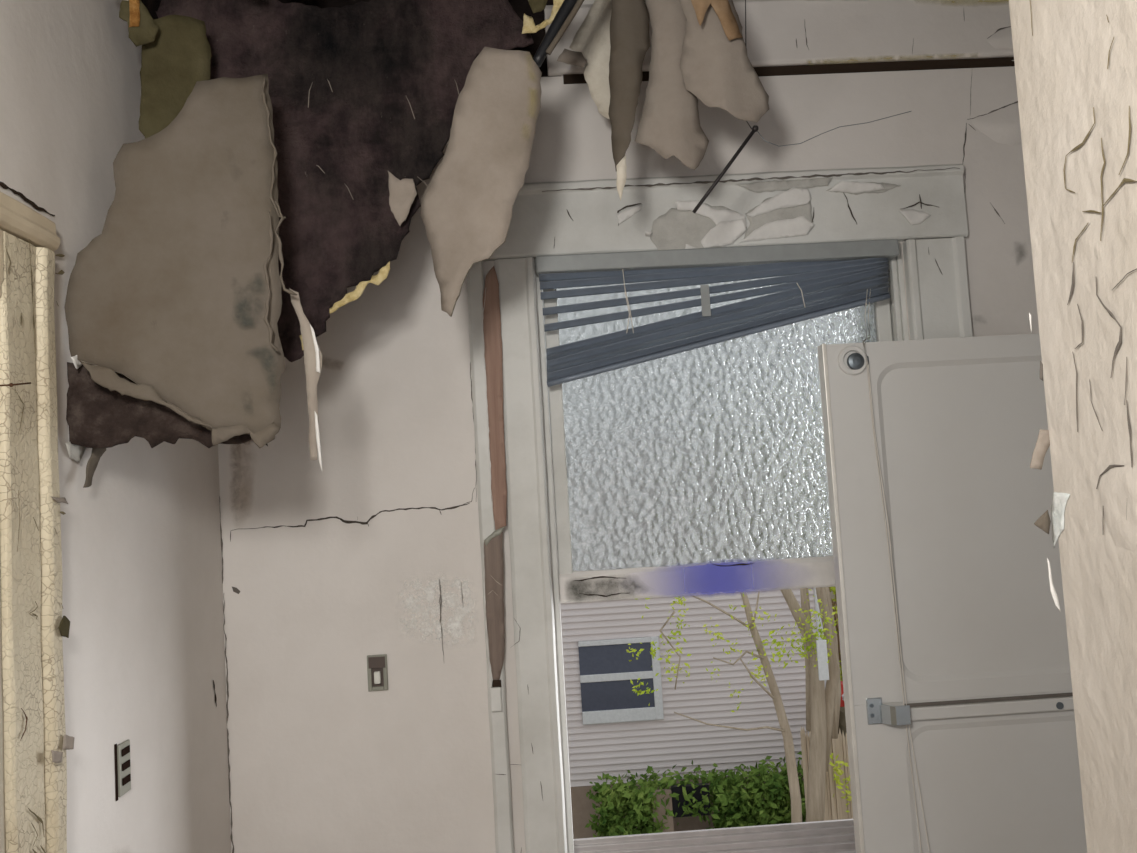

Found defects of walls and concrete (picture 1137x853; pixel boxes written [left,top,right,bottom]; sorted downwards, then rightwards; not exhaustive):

peeling [645,177,901,250]
crack [1063,106,1137,467]
peeling [66,442,106,488]
peeling [58,603,70,638]
crack [219,452,477,853]
peeling [51,735,74,763]